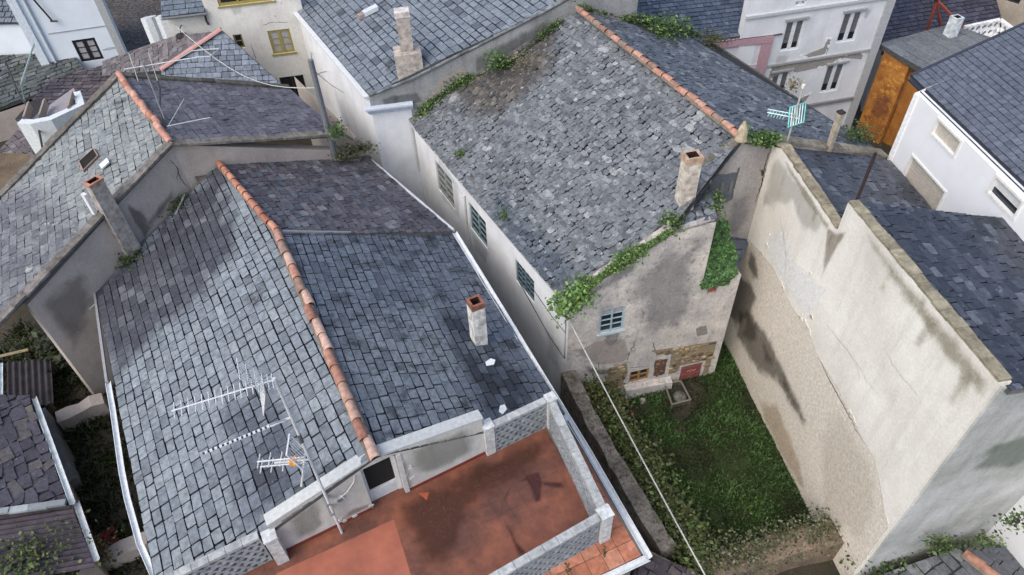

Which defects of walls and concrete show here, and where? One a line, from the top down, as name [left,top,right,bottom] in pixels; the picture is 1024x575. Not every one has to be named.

leakage [731,257,802,419]
leakage [894,275,981,384]
leakage [419,435,466,469]
leakage [410,446,562,556]
peeling [723,239,889,575]